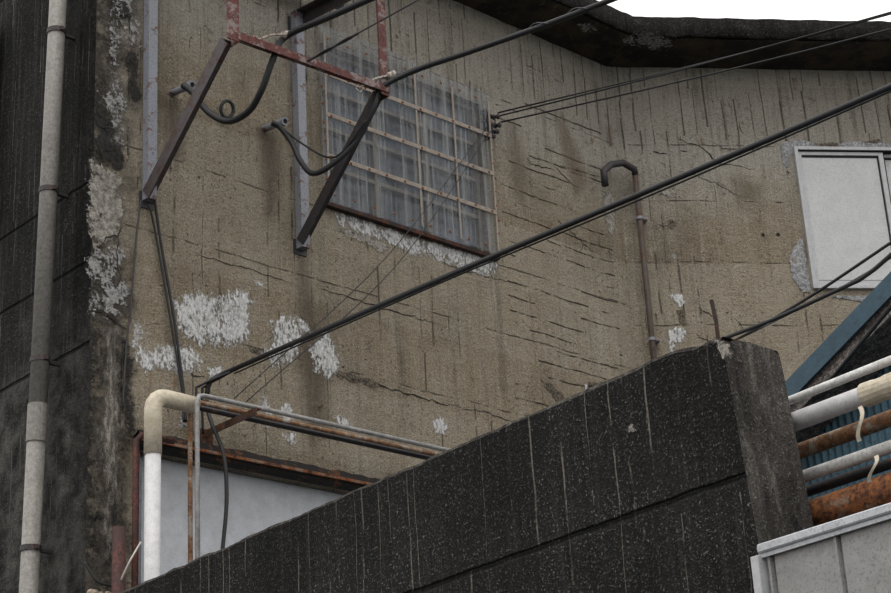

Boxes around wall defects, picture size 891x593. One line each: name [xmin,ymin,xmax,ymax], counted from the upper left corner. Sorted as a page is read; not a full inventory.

peeling [335,212,498,276]
spalling [75,0,263,577]
peeling [261,316,339,379]
peeling [667,294,688,352]